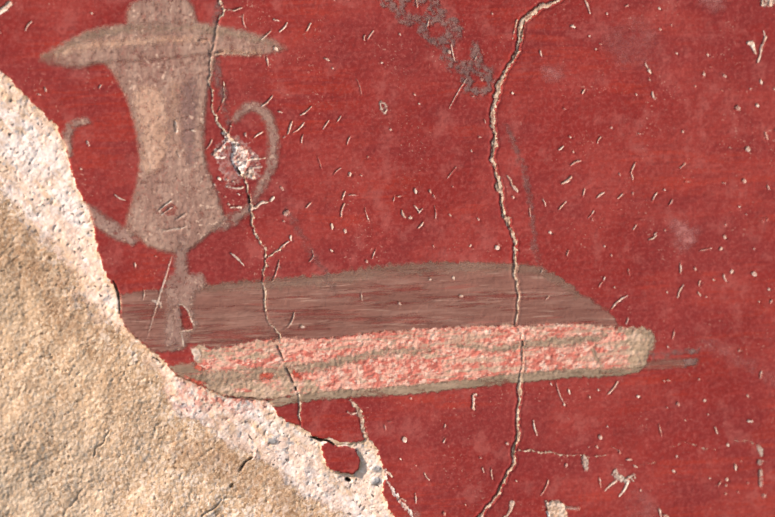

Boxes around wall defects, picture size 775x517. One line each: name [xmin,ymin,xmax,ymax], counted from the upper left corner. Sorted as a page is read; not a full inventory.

crack [206,0,249,145]
flaking render [0,71,395,517]
crack [239,174,301,420]
crack [478,0,602,517]
crack [384,469,413,517]
peeling [543,482,567,517]